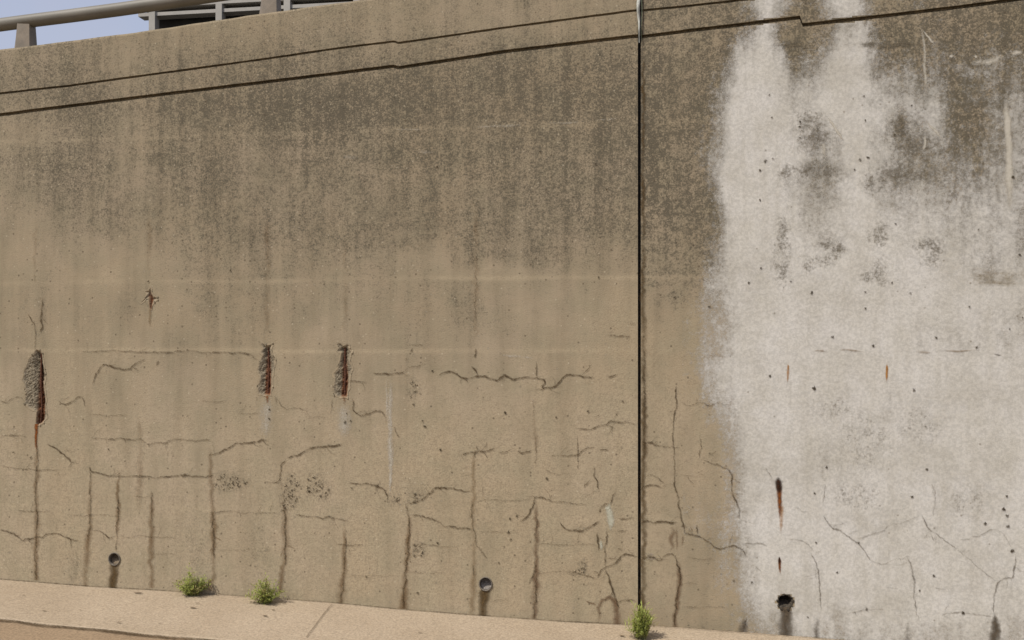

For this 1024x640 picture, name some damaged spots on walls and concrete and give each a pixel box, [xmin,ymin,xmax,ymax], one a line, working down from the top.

spalling [22,349,48,447]